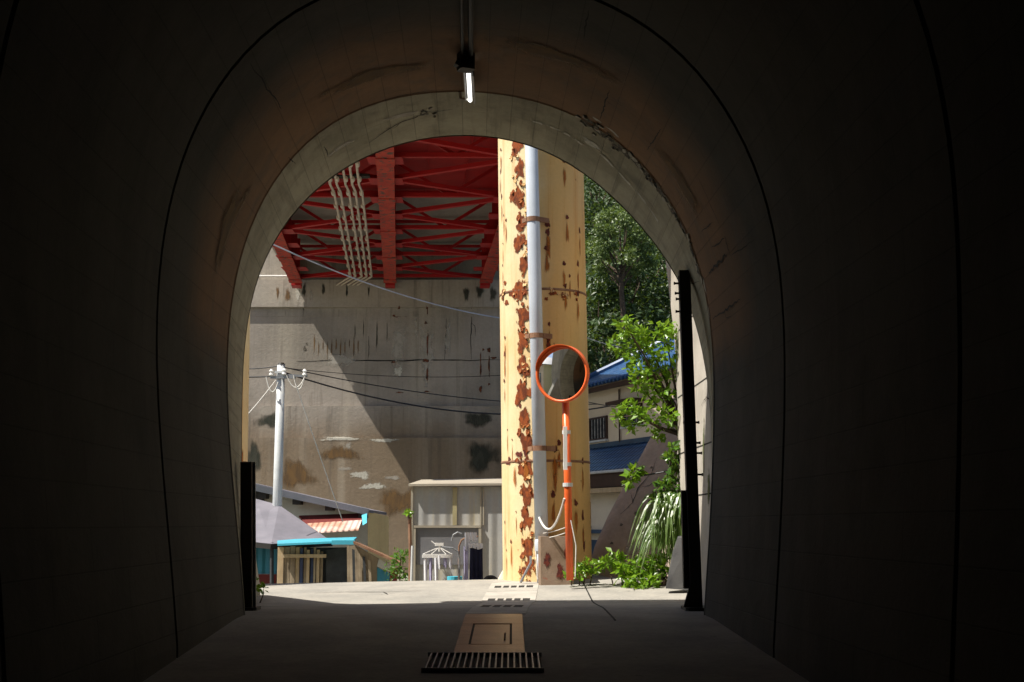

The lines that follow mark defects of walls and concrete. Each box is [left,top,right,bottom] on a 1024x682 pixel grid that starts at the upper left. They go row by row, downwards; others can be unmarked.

rust [544,261,580,317]
rust [479,142,566,582]
water stain [466,413,491,427]
water stain [470,444,499,472]
rust [575,499,585,565]